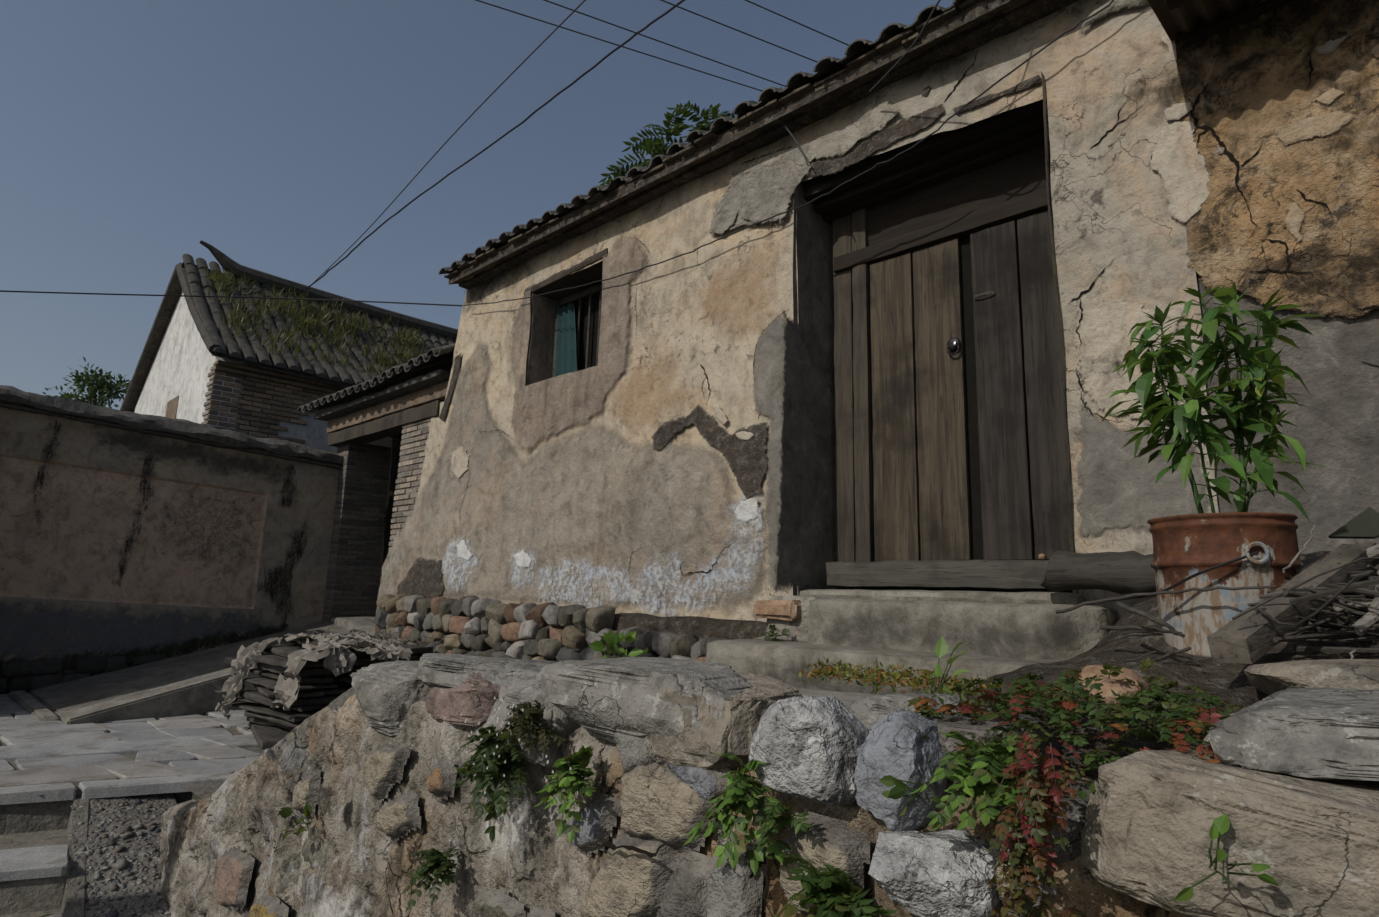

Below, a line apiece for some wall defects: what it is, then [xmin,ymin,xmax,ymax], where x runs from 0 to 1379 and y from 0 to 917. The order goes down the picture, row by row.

crack [1090,102,1143,149]
crack [1190,84,1315,290]
crack [1297,189,1333,218]
leakage [0,530,307,660]
leakage [100,434,297,586]
leakage [442,537,478,592]
spalling [386,311,859,607]
leakage [510,495,763,615]
crack [596,841,678,917]